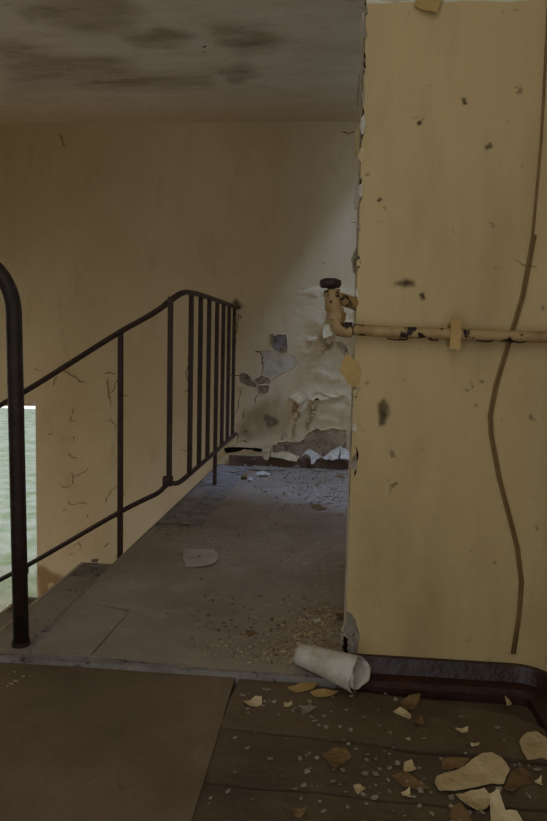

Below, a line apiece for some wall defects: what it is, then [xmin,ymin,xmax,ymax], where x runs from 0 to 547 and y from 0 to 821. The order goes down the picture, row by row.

peeling [355,0,368,163]
peeling [351,244,361,275]
peeling [239,333,299,396]
crack [47,407,124,518]
peeling [224,446,294,476]